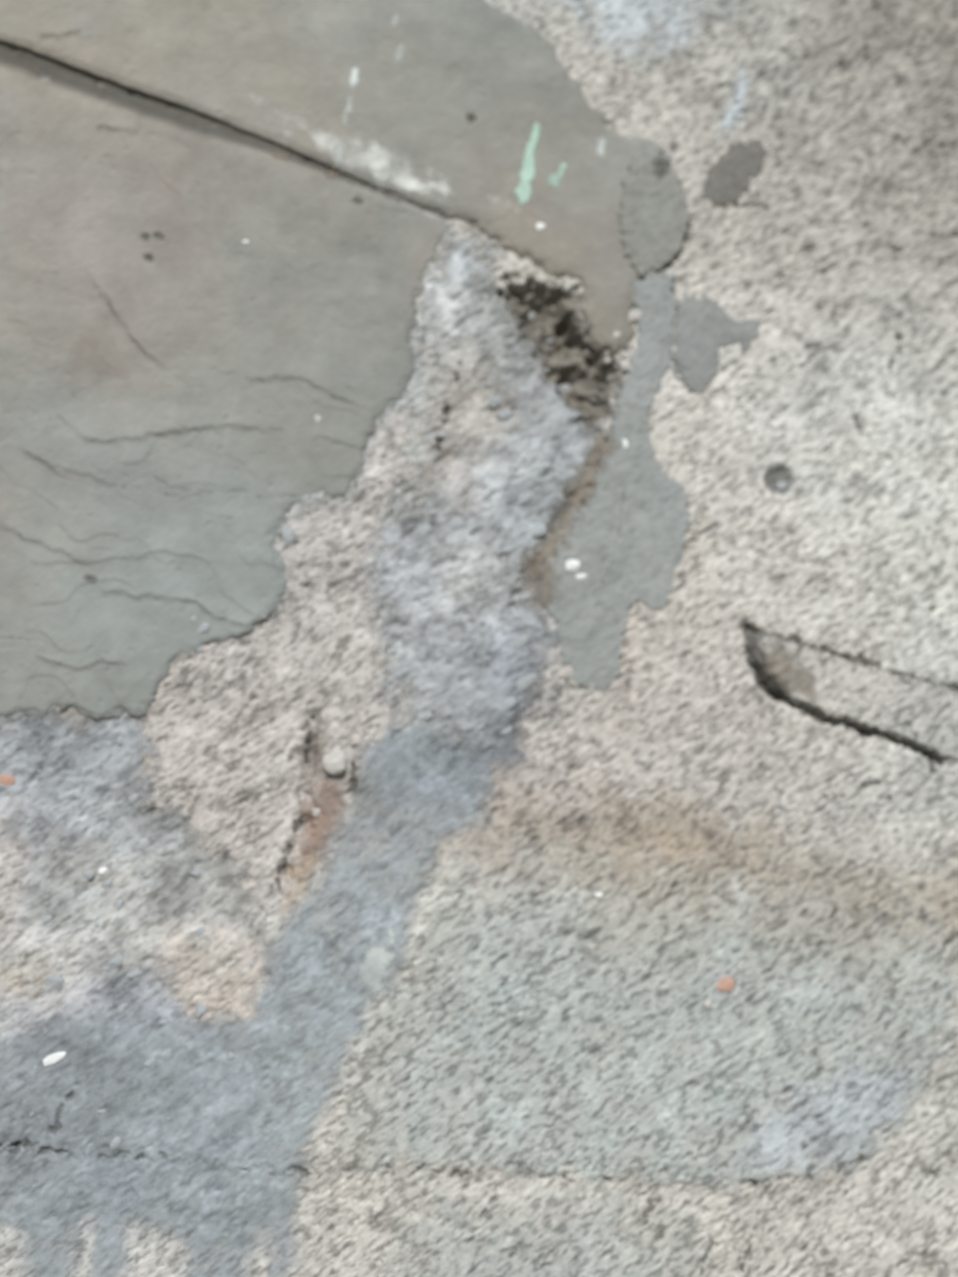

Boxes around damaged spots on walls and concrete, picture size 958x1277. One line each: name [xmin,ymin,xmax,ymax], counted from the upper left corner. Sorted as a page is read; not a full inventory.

water stain [0,733,490,1277]
spalling [0,241,616,1202]
crack [746,631,958,773]
crack [825,781,889,816]